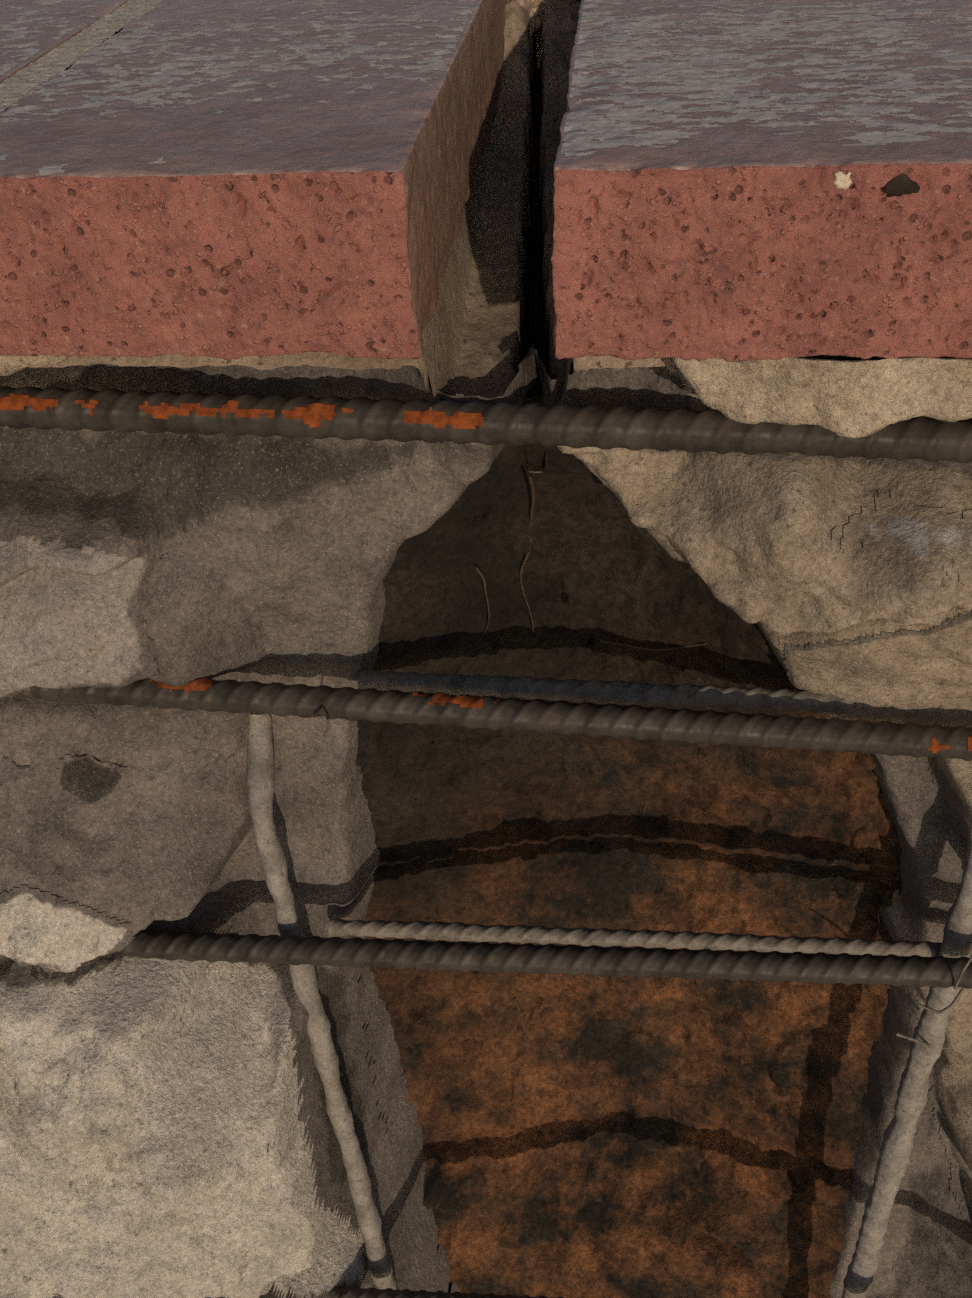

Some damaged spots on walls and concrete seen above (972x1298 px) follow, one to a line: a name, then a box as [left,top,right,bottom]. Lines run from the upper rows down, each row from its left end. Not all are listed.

crack [518,32,550,397]
corrosion [0,393,59,411]
corrosion [75,399,98,416]
corrosion [139,400,353,428]
corrosion [404,407,484,429]
corrosion [149,677,212,693]
corrosion [412,691,504,709]
corrosion [928,737,951,753]
spalling [0,355,972,1298]